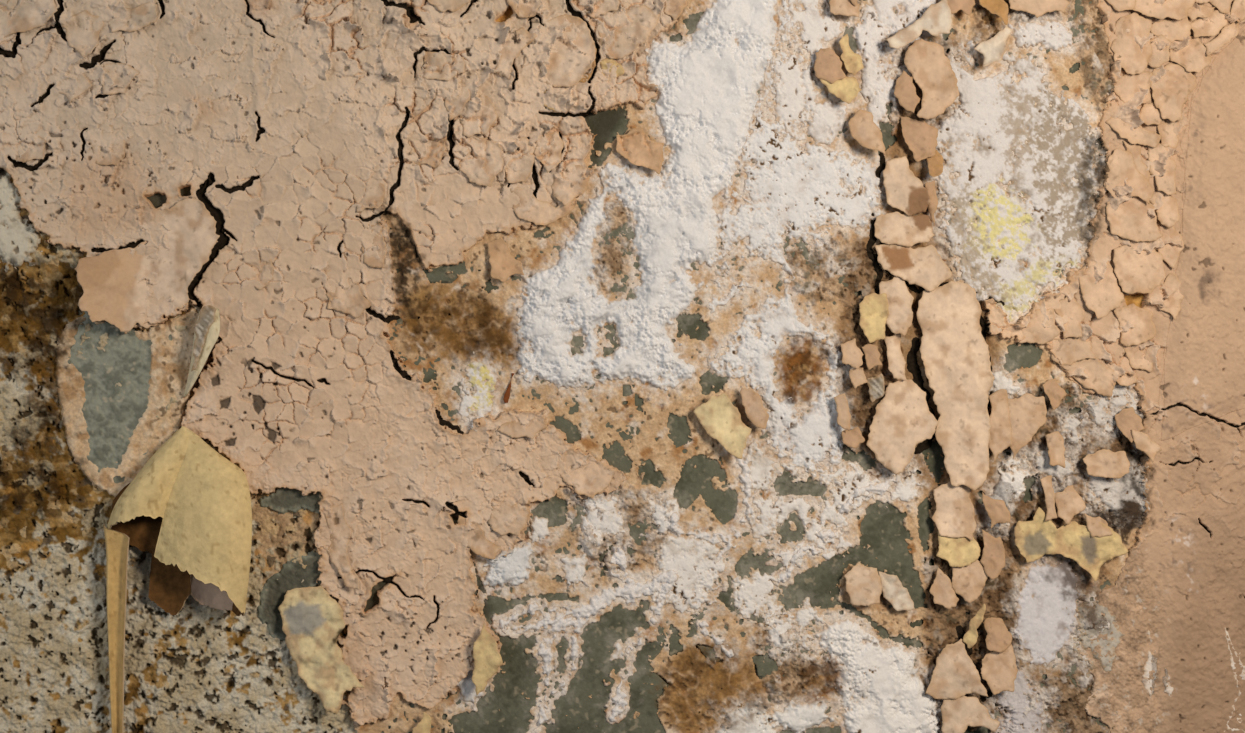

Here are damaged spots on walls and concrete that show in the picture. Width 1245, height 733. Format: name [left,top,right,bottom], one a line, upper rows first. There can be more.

crack [7,128,88,171]
crack [0,0,120,98]
crack [188,173,260,307]
crack [337,107,410,258]
crack [381,0,451,78]
crack [507,0,600,197]
water stain [931,19,1109,323]
water stain [0,167,82,516]
crack [365,307,412,381]
peeling [0,0,962,733]
water stain [385,0,942,733]
peeling [769,0,1245,733]